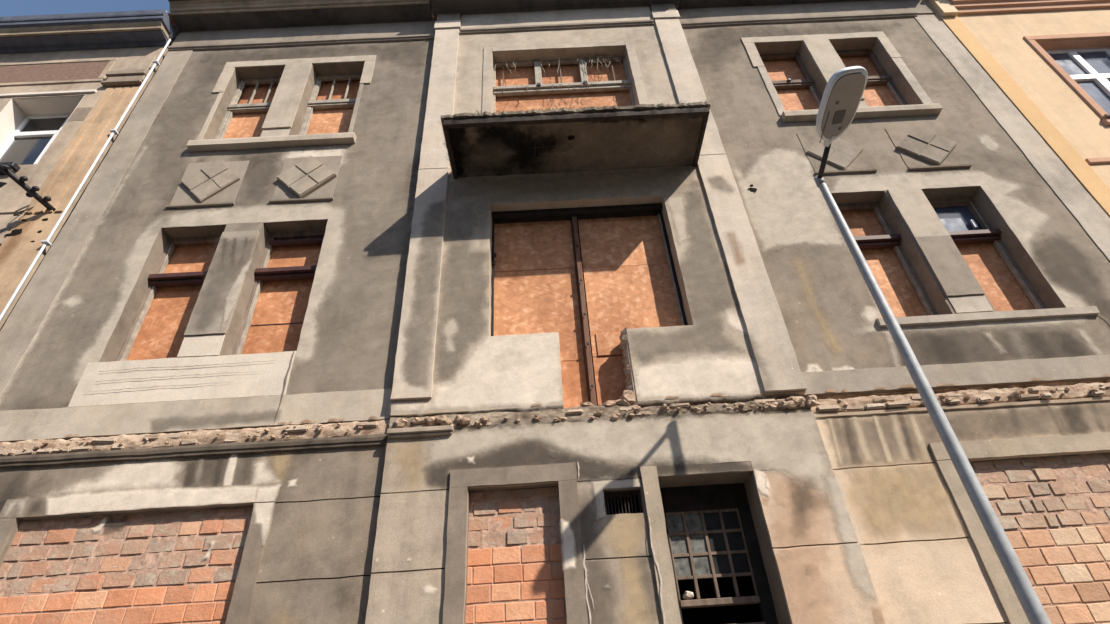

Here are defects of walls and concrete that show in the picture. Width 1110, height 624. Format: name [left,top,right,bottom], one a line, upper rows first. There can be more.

leakage [446,121,559,176]
spalling [619,328,652,418]
flaking render [754,384,925,412]
flaking render [937,383,963,405]
flaking render [1018,378,1065,401]
flaking render [0,437,125,456]